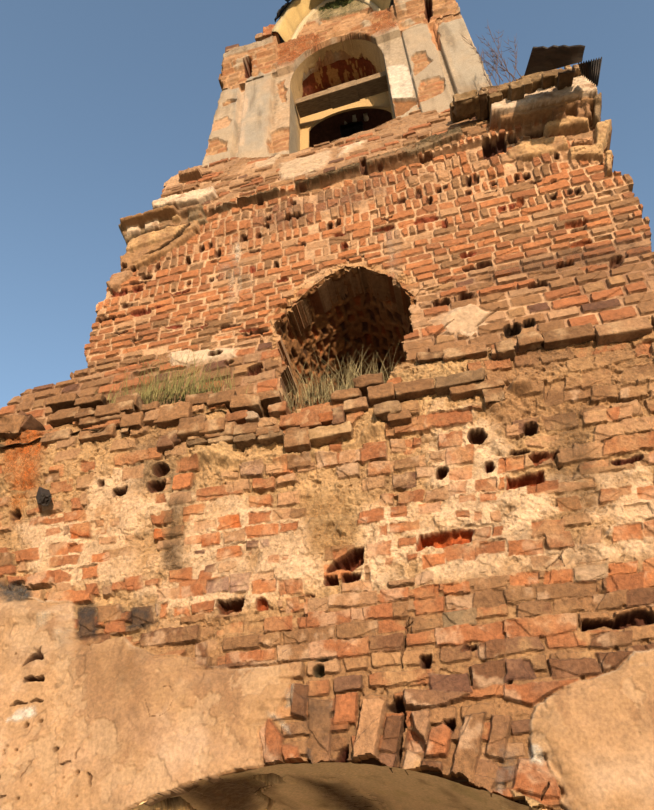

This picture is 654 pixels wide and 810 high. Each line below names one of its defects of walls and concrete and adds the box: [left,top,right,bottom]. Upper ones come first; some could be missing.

spalling [302,50,378,97]
spalling [388,50,446,117]
spalling [467,427,489,445]
spalling [505,446,561,490]
spalling [415,527,475,552]
spalling [323,546,365,587]
leakage [77,605,98,639]
leakage [129,607,150,630]
crack [401,615,413,668]
spalling [580,606,654,632]
peeling [0,584,295,810]
peeling [528,647,654,810]